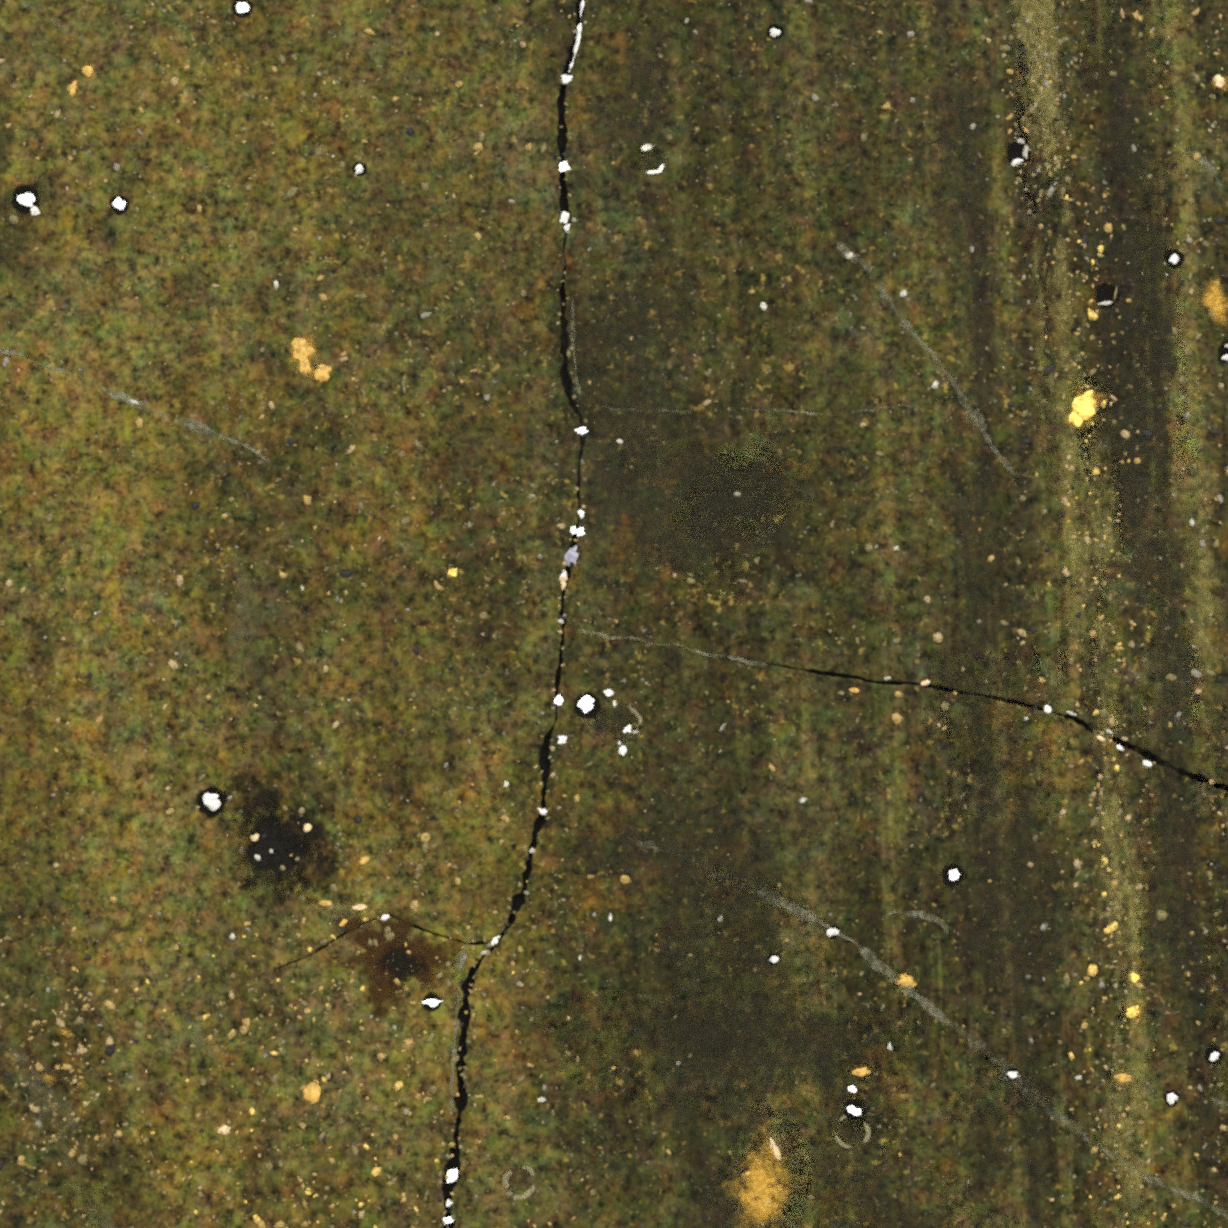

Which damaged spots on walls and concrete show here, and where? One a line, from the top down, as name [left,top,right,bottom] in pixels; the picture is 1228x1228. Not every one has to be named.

crack [274,0,1228,1228]
leakage [227,778,340,907]
leakage [337,904,459,1014]